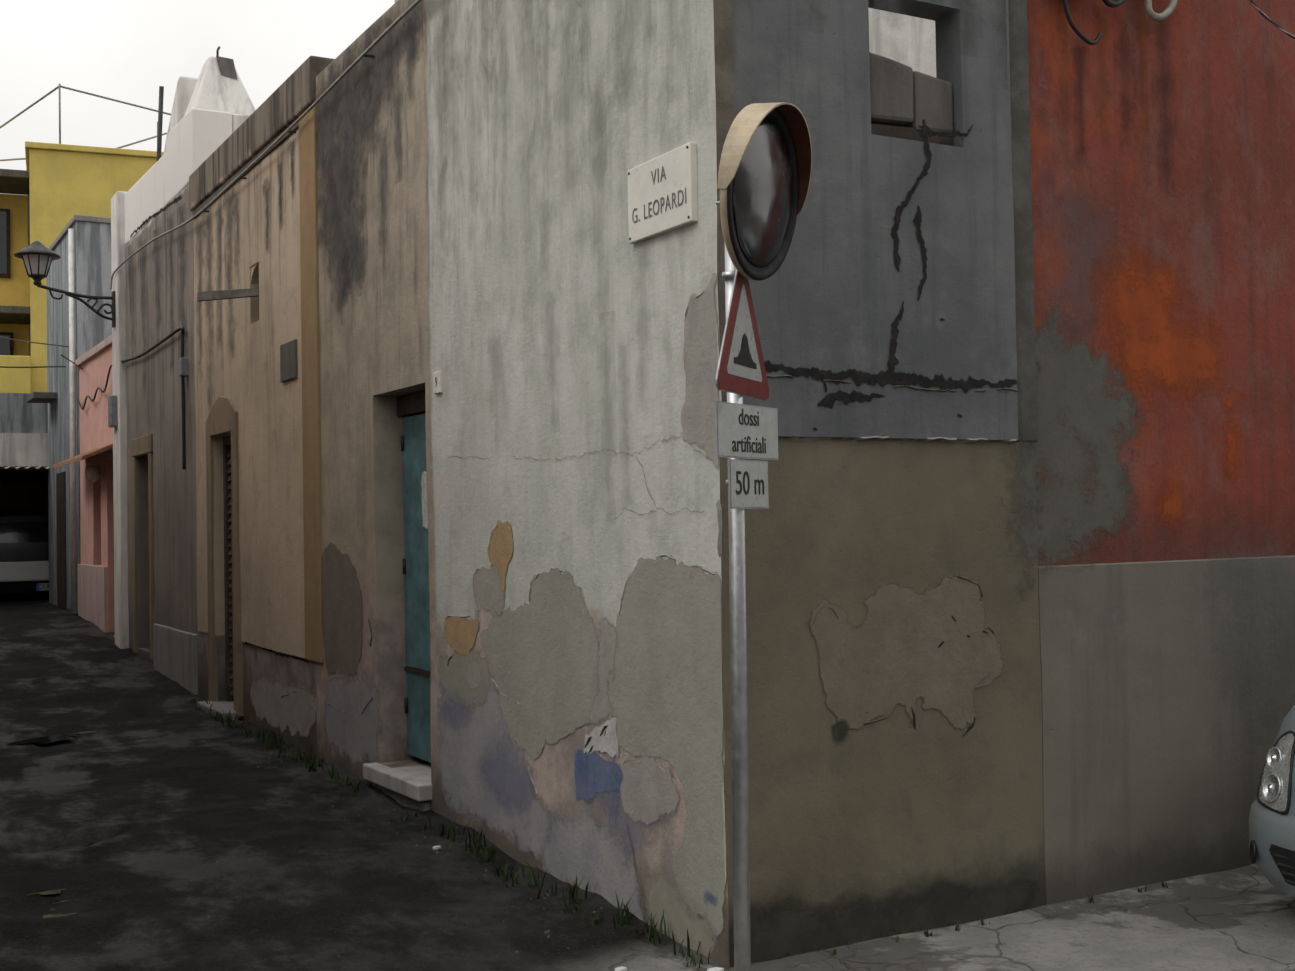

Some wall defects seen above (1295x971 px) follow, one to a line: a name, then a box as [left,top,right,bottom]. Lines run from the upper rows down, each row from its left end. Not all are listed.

leakage [316,3,423,308]
crack [764,120,1017,408]
peeling [681,273,719,468]
peeling [444,615,479,666]
peeling [487,520,514,591]
crack [448,432,699,519]
peeling [437,673,715,958]